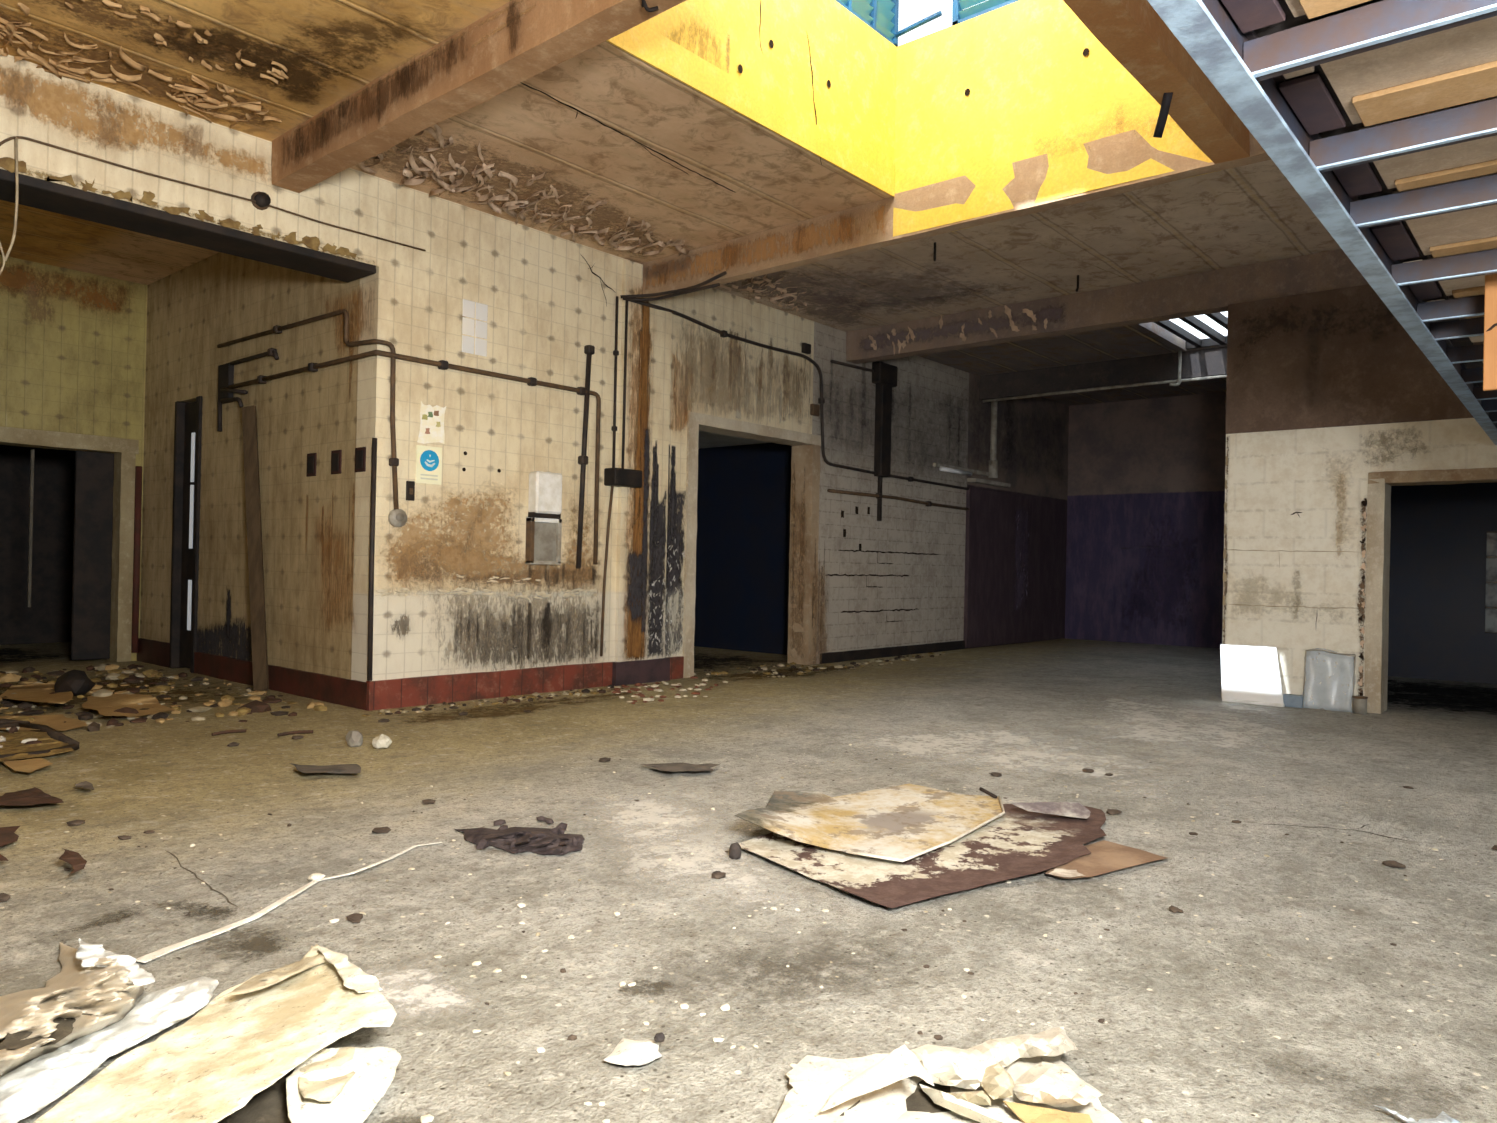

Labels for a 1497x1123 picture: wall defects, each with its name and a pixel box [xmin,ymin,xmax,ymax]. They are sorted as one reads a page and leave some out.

peeling [0,0,289,128]
spalling [0,157,374,262]
peeling [359,124,689,257]
leakage [0,265,129,319]
leakage [680,327,810,420]
peeling [718,271,1065,354]
leakage [649,441,676,581]
leakage [389,493,599,668]